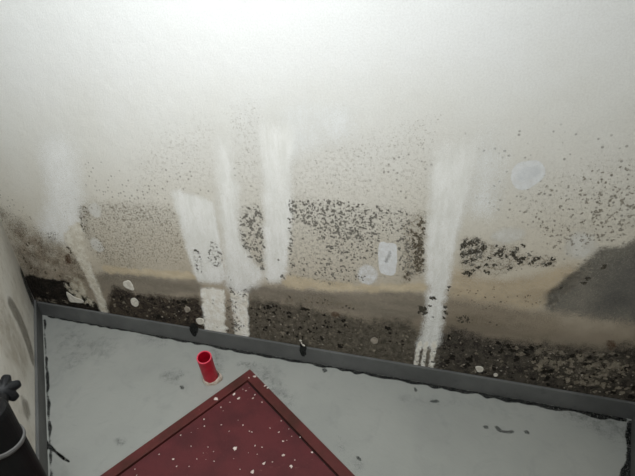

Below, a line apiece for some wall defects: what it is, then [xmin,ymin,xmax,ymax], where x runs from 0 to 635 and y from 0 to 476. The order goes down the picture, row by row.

water stain [0,112,223,329]
water stain [224,103,635,402]